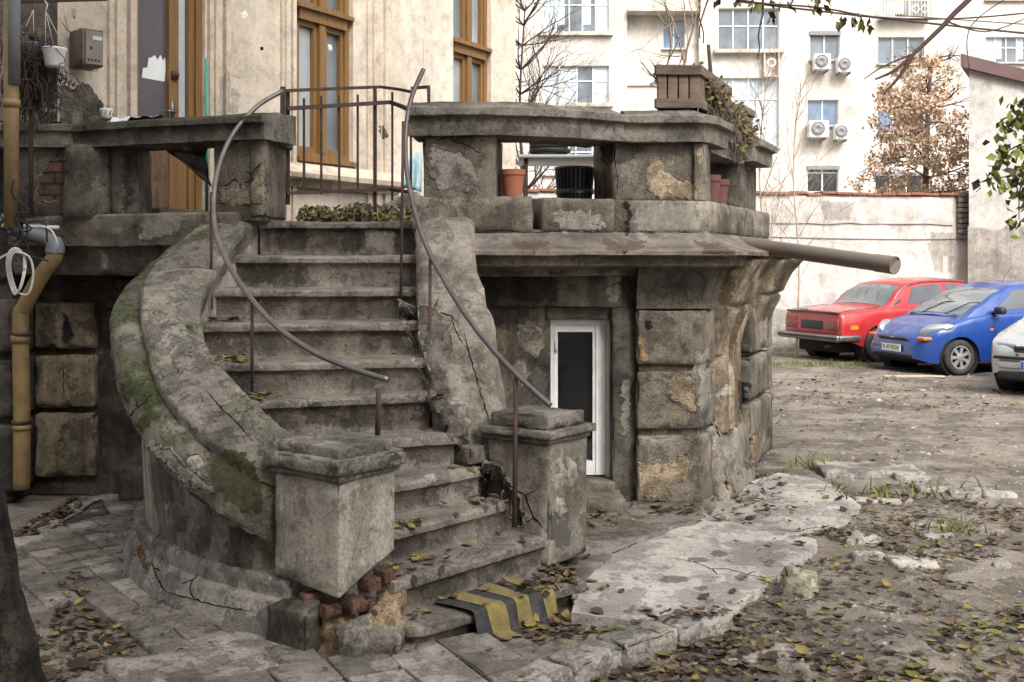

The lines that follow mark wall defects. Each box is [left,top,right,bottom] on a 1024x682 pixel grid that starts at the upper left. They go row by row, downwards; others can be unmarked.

crack [219,161,265,201]
peeling [426,143,481,196]
spalling [644,157,701,201]
crack [417,299,492,425]
crack [205,390,250,437]
spalling [667,373,698,413]
spalling [476,461,527,530]
crack [503,483,544,528]
spalling [633,452,693,499]
crack [151,562,256,612]